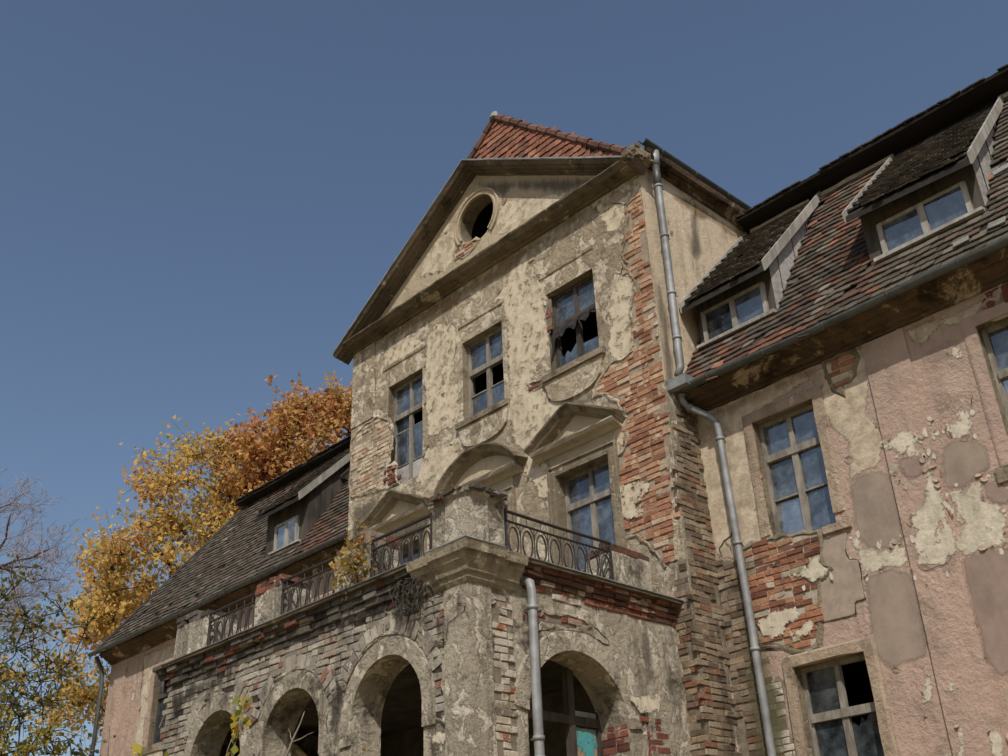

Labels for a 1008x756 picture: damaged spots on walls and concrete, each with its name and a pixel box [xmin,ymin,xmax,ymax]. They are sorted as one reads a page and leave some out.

flaking render [421,229,481,278]
flaking render [496,191,567,235]
flaking render [383,323,461,495]
flaking render [493,255,563,501]
flaking render [590,186,1008,756]
flaking render [131,592,445,756]